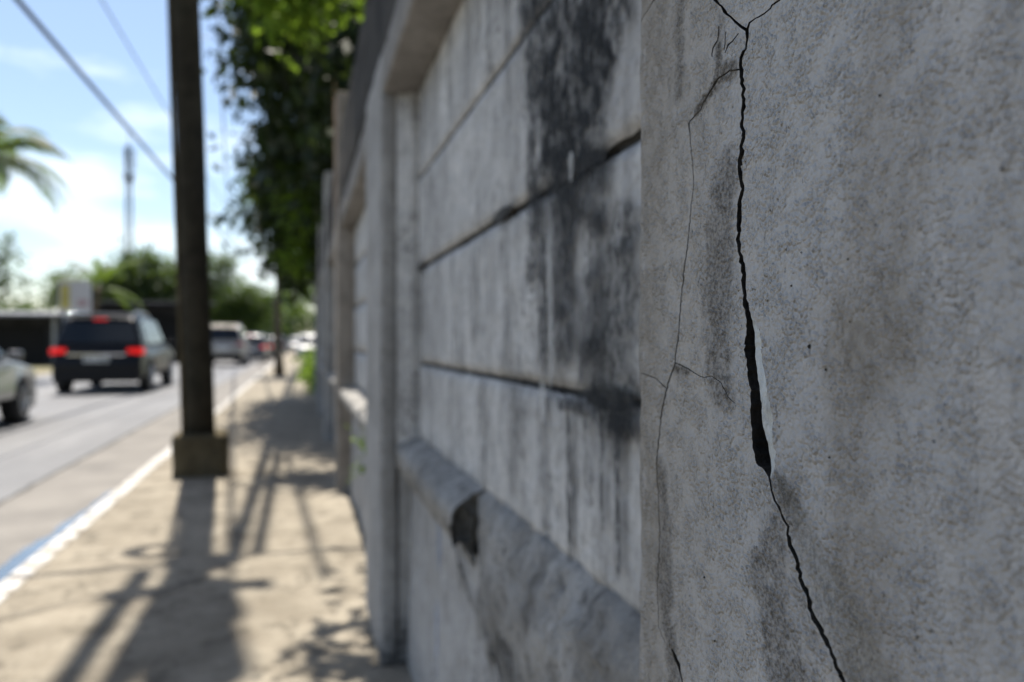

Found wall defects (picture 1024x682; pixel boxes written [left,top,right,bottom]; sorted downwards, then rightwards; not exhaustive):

leakage [518,0,634,576]
crack [641,0,846,682]